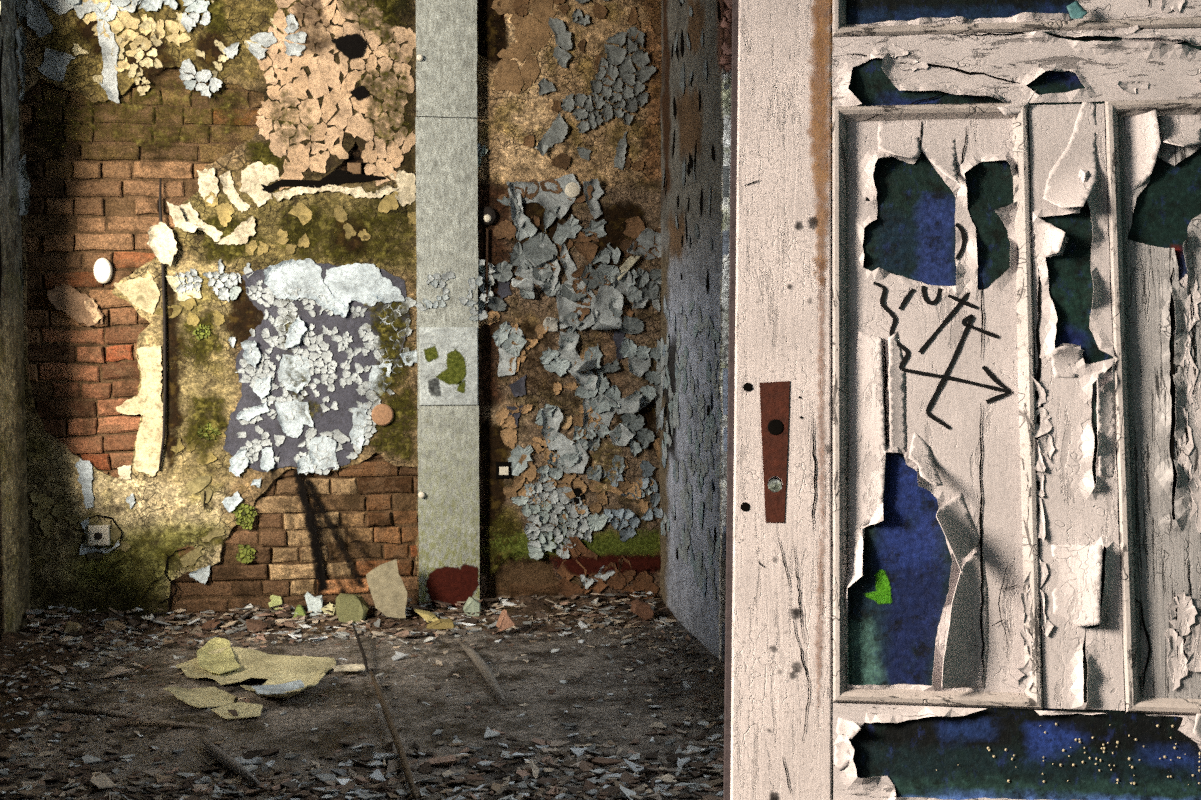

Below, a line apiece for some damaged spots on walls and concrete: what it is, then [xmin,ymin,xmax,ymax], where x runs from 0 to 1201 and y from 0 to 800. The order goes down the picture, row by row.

crack [950,29,1104,41]
corrosion [810,0,830,283]
crack [851,54,1020,148]
spalling [0,0,732,616]
water stain [301,473,371,595]